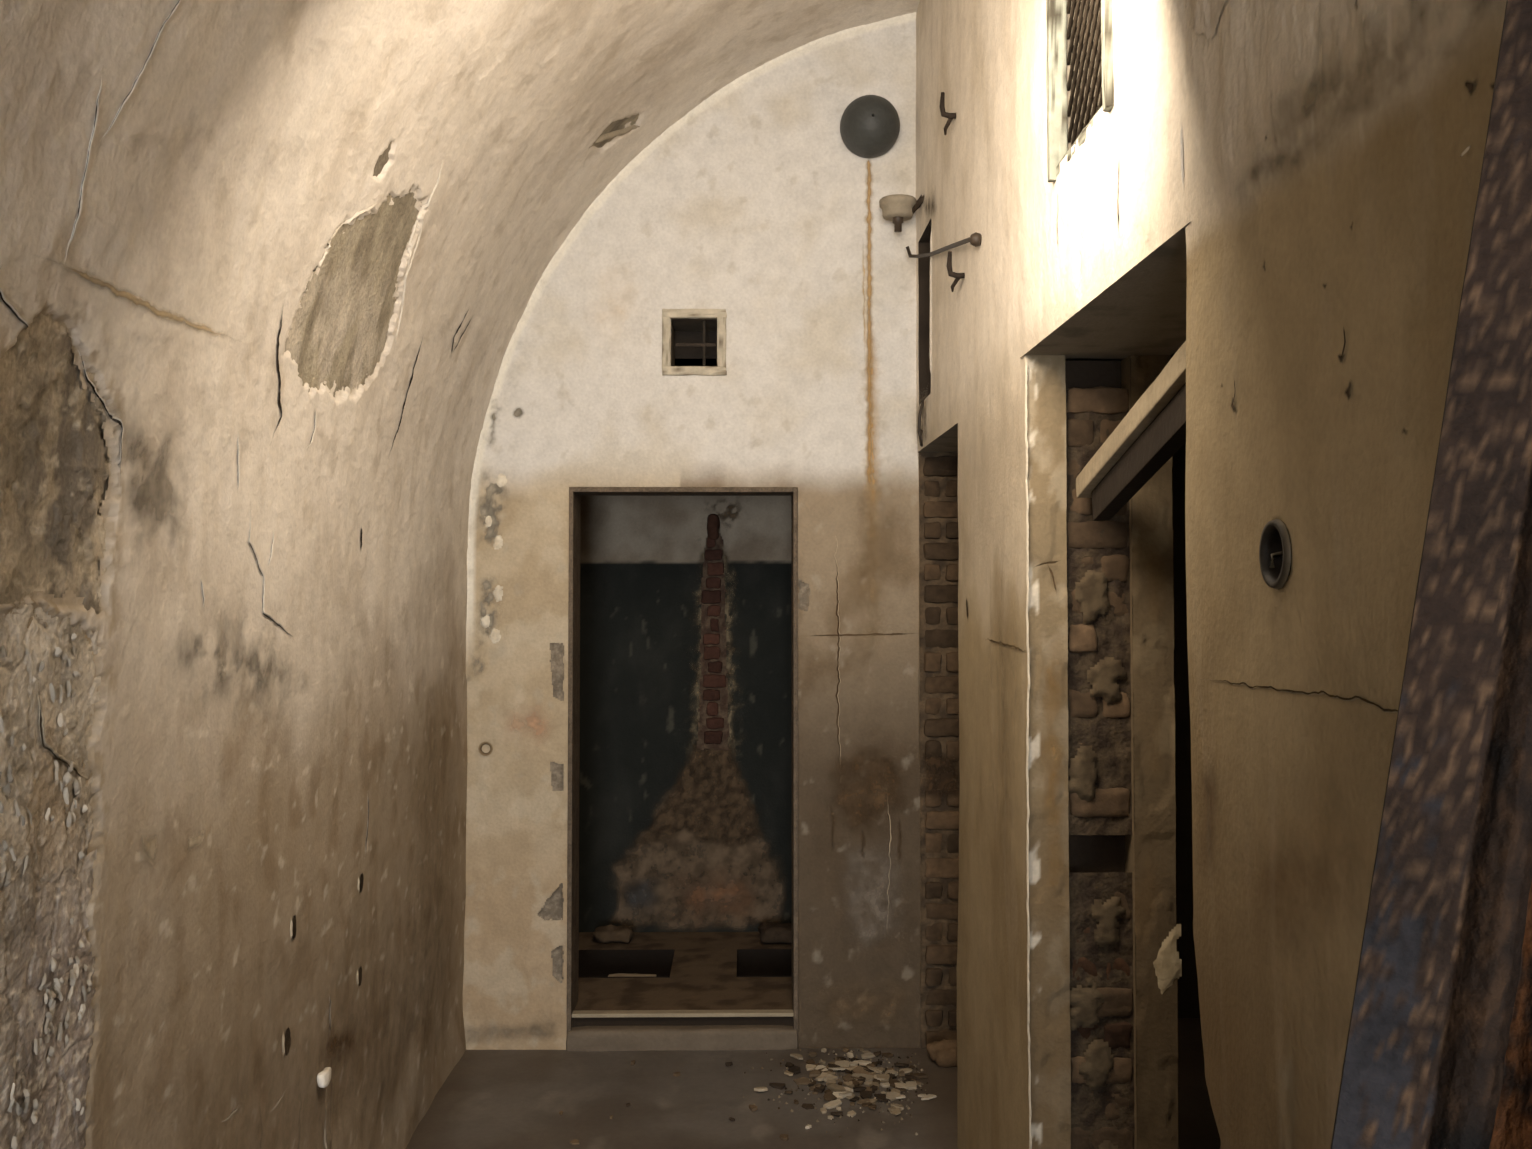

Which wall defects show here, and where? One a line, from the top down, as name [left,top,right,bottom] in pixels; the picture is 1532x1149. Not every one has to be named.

crack [63,0,181,271]
flaking render [284,158,445,397]
flaking render [373,141,392,177]
rust [863,161,875,492]
peeling [130,437,176,523]
flaking render [0,314,112,1149]
crack [1195,677,1398,713]